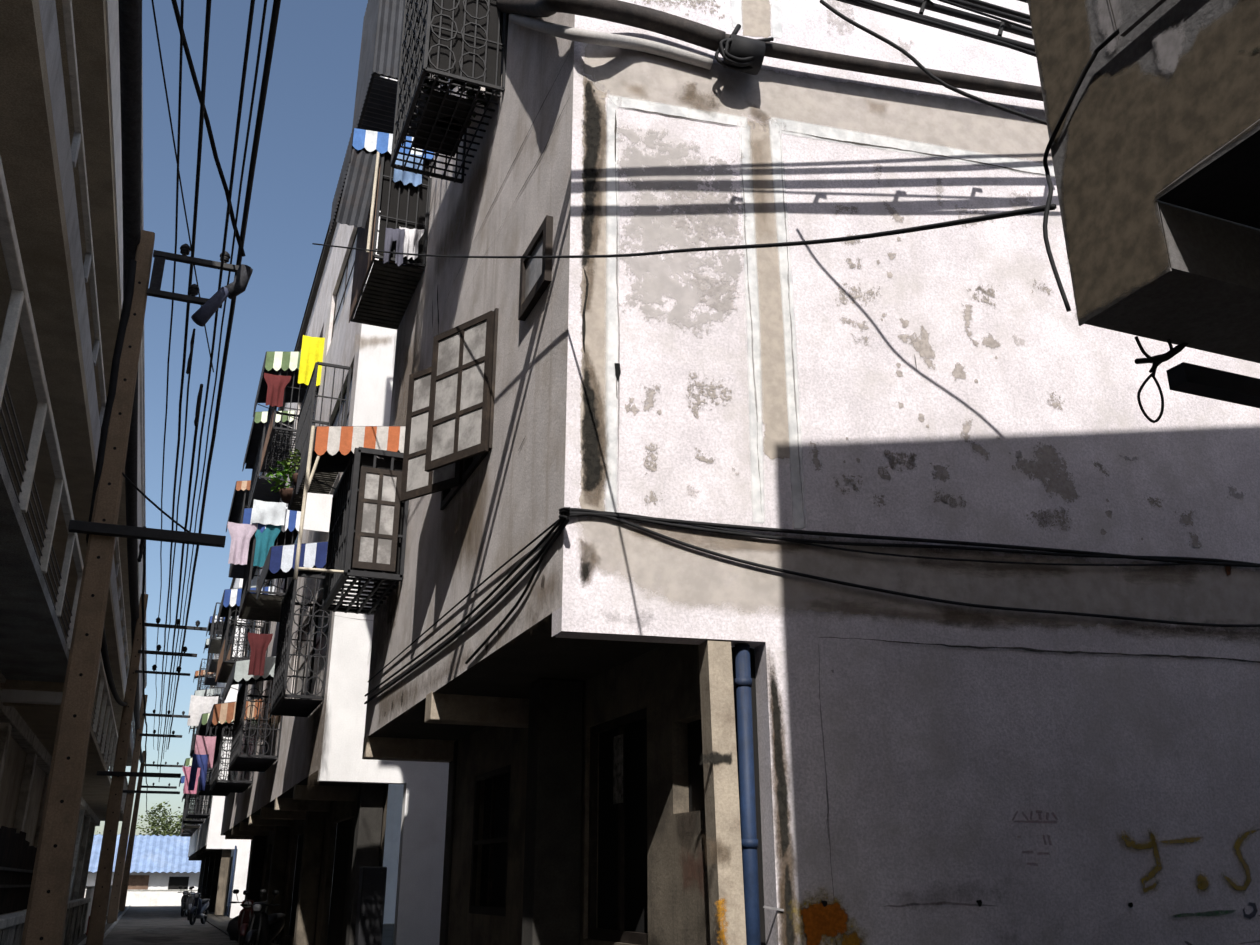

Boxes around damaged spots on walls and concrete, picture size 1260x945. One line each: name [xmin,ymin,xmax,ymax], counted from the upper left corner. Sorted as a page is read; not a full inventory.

peeling [634,0,725,19]
peeling [936,178,986,227]
peeling [1010,192,1032,222]
leakage [582,83,607,505]
peeling [579,76,745,511]
peeling [835,234,935,377]
peeling [963,284,1025,359]
peeling [952,363,978,383]
peeling [878,450,966,507]
peeling [1009,442,1079,531]
leakage [581,544,595,581]
leakage [771,677,797,945]